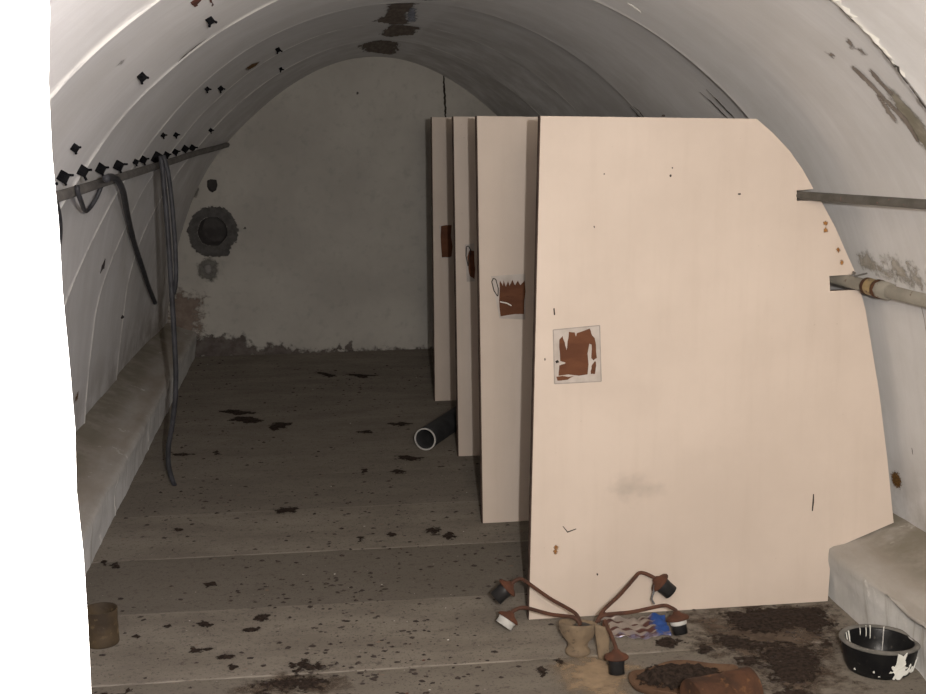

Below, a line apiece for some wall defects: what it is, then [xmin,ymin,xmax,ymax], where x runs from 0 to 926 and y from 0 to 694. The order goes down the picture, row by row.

leakage [168,291,381,357]
corrosion [891,471,902,488]